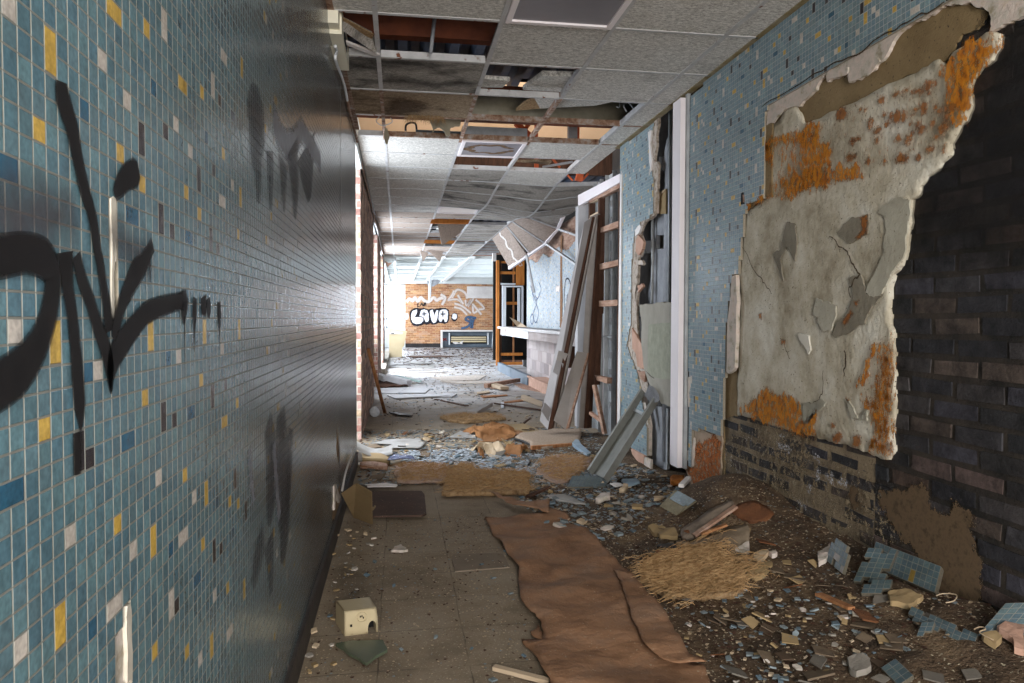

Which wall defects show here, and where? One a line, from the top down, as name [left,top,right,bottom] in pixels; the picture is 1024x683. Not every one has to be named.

spalling [766,0,1024,125]
corrosion [746,31,1004,211]
spalling [628,118,671,428]
spalling [773,222,798,281]
spalling [837,213,870,244]
spalling [832,274,882,338]
spalling [798,333,812,354]
corrosion [738,386,817,437]
corrosion [831,332,897,457]
corrosion [687,435,721,484]